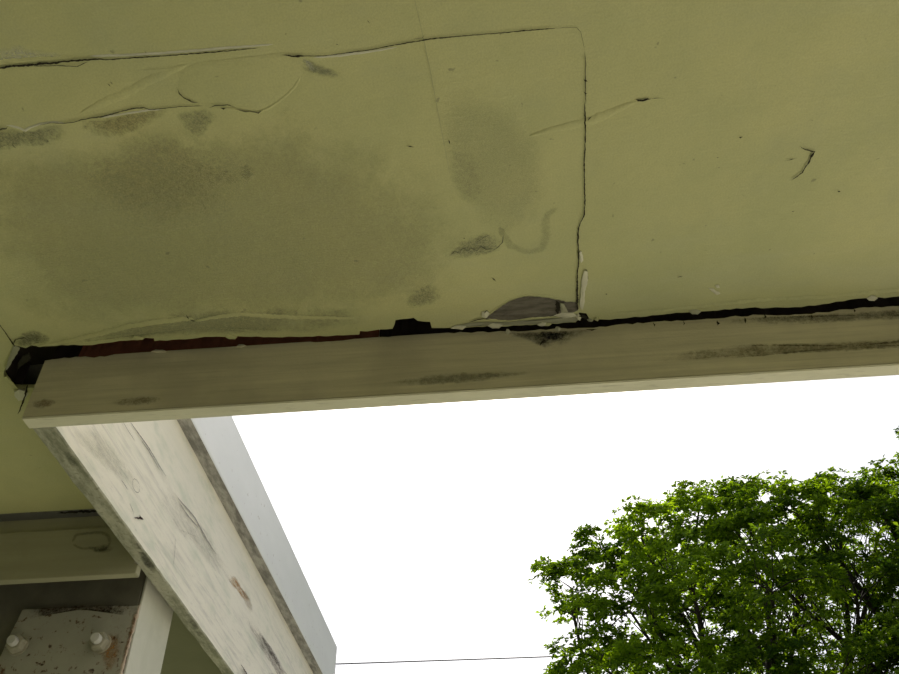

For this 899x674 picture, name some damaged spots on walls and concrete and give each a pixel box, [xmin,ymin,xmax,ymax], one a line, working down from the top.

crack [0,27,592,311]
leakage [778,341,899,353]